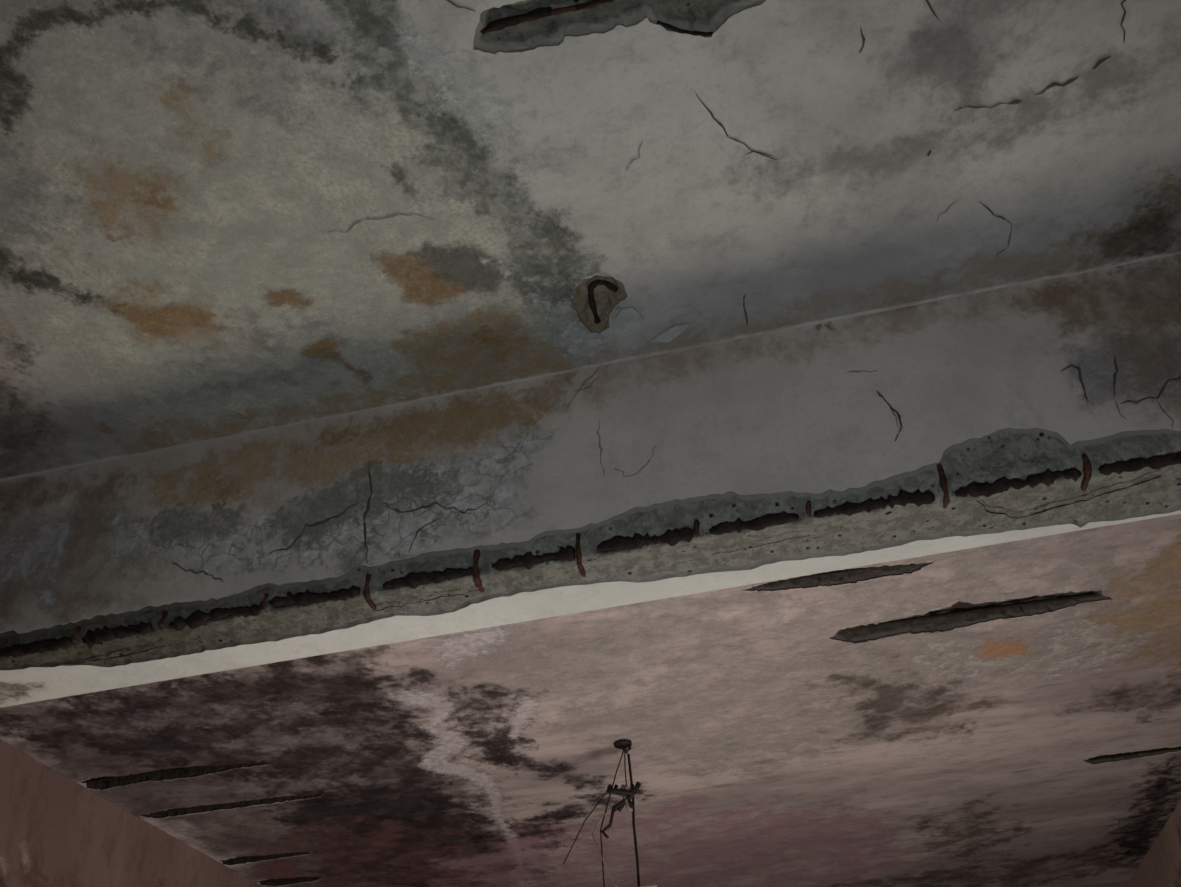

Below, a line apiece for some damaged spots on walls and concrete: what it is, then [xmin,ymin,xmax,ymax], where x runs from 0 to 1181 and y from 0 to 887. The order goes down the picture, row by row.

corrosion [106,292,225,341]
damp [0,0,565,440]
corrosion [267,291,310,308]
peeling [329,0,766,334]
crack [695,93,777,160]
spalling [0,428,1181,670]
damp [0,539,1181,887]